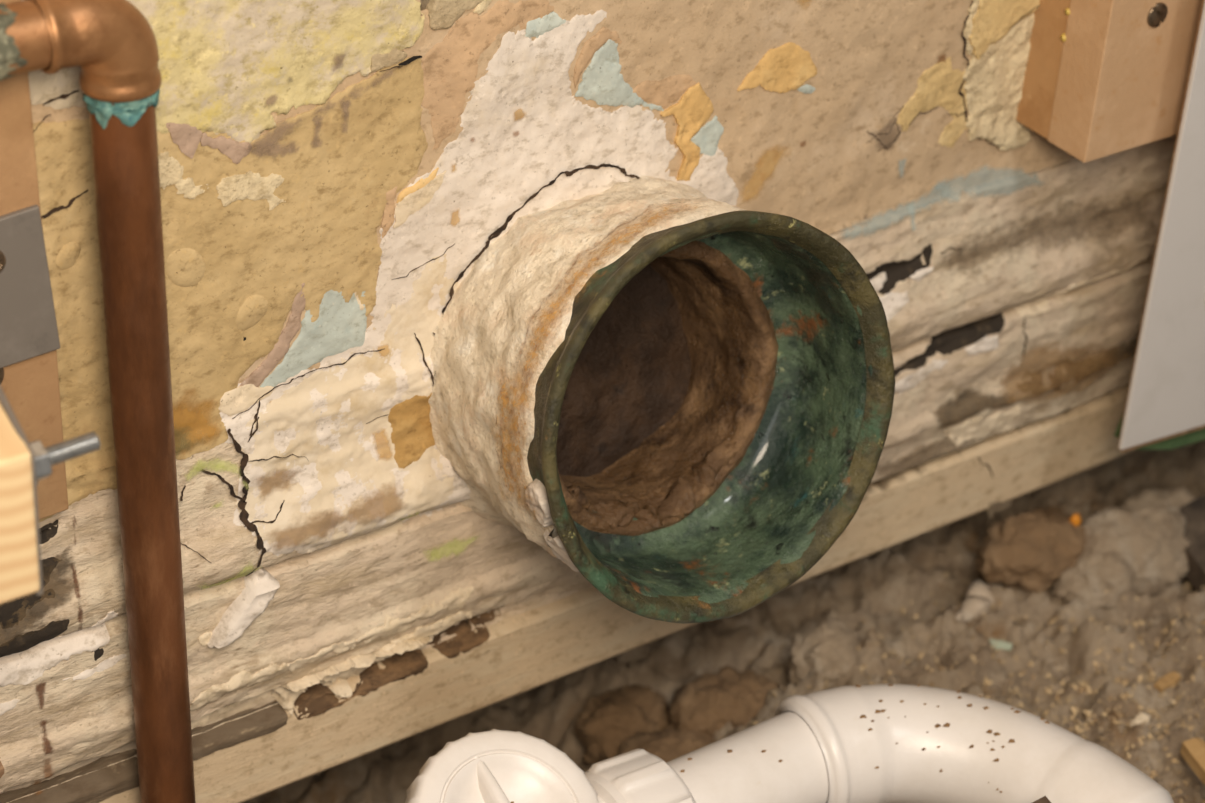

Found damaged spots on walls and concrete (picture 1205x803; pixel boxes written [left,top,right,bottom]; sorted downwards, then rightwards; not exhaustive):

flaking render [897,0,1040,151]
peeling [28,66,117,507]
peeling [128,0,739,648]
crack [392,163,640,385]
peeling [866,244,934,322]
peeling [894,261,1144,395]
peeling [39,515,58,544]
crack [180,348,385,577]
peeling [0,552,126,716]
peeling [190,586,505,730]